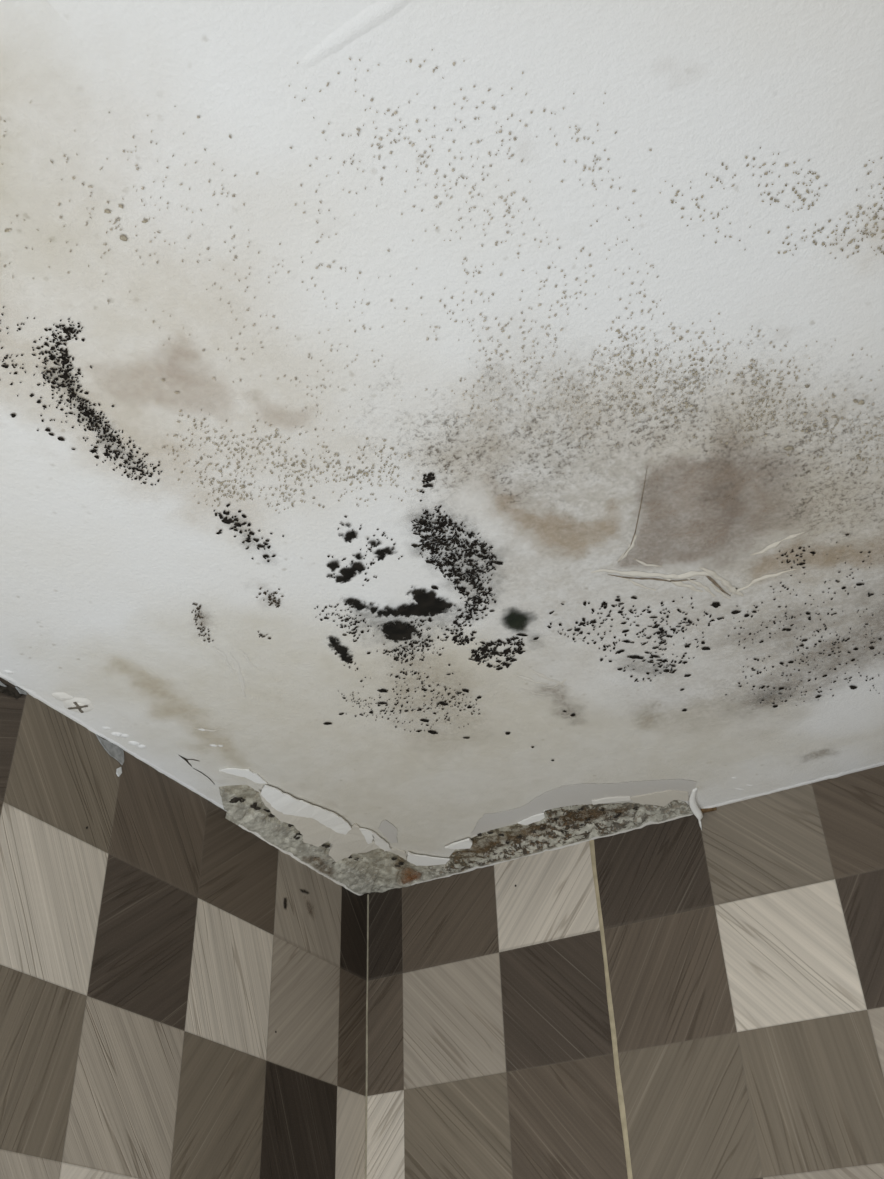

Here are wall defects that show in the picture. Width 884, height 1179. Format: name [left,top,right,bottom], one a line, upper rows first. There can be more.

damp [0,58,884,739]
spalling [219,768,717,896]